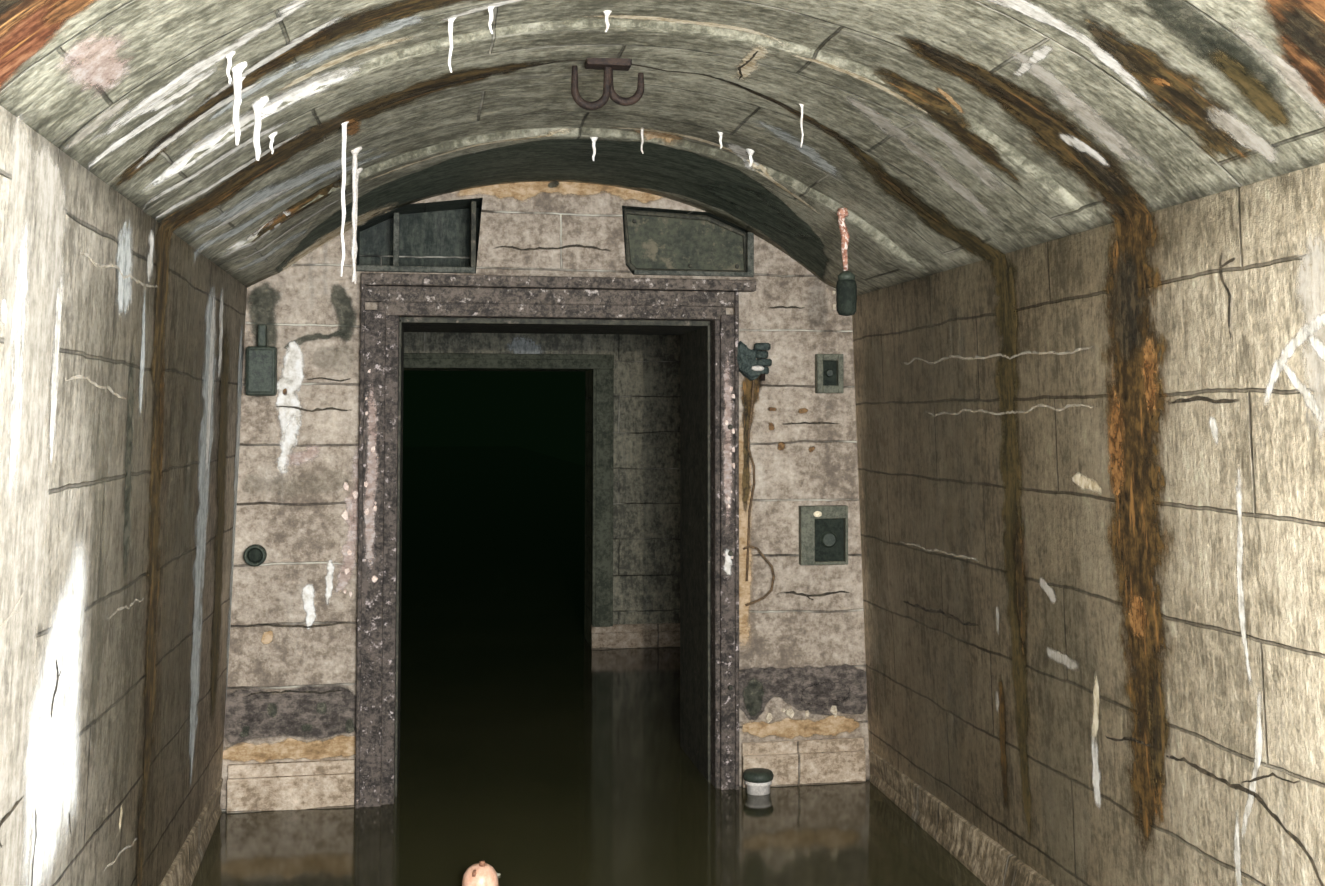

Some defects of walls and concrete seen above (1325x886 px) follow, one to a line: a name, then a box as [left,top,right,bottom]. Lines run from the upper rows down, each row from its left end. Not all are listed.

corrosion [0,0,96,88]
efflorescence [65,0,307,167]
corrosion [877,67,1019,181]
corrosion [1086,20,1251,160]
corrosion [1265,0,1325,106]
water stain [117,18,418,571]
water stain [0,121,85,886]
water stain [190,152,392,775]
corrosion [906,38,1172,850]
spalling [739,664,867,723]
water stain [1092,677,1101,807]
crack [1106,736,1324,886]